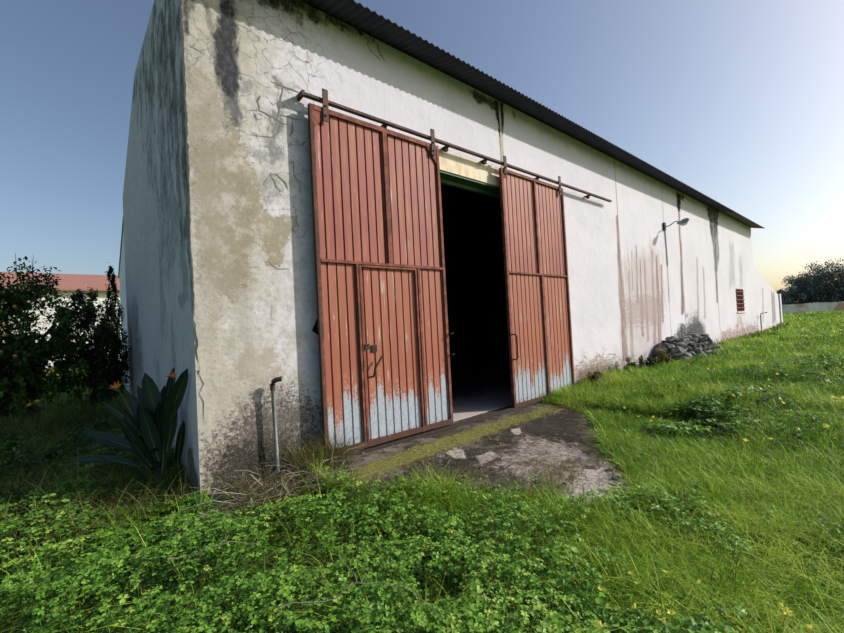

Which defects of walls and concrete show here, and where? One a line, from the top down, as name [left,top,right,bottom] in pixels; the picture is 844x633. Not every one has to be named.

damp [133,0,194,240]
damp [206,0,242,127]
peeling [187,72,298,302]
crack [243,81,303,192]
damp [259,0,374,41]
corrosion [617,217,627,358]
damp [711,230,719,302]
damp [200,386,323,497]